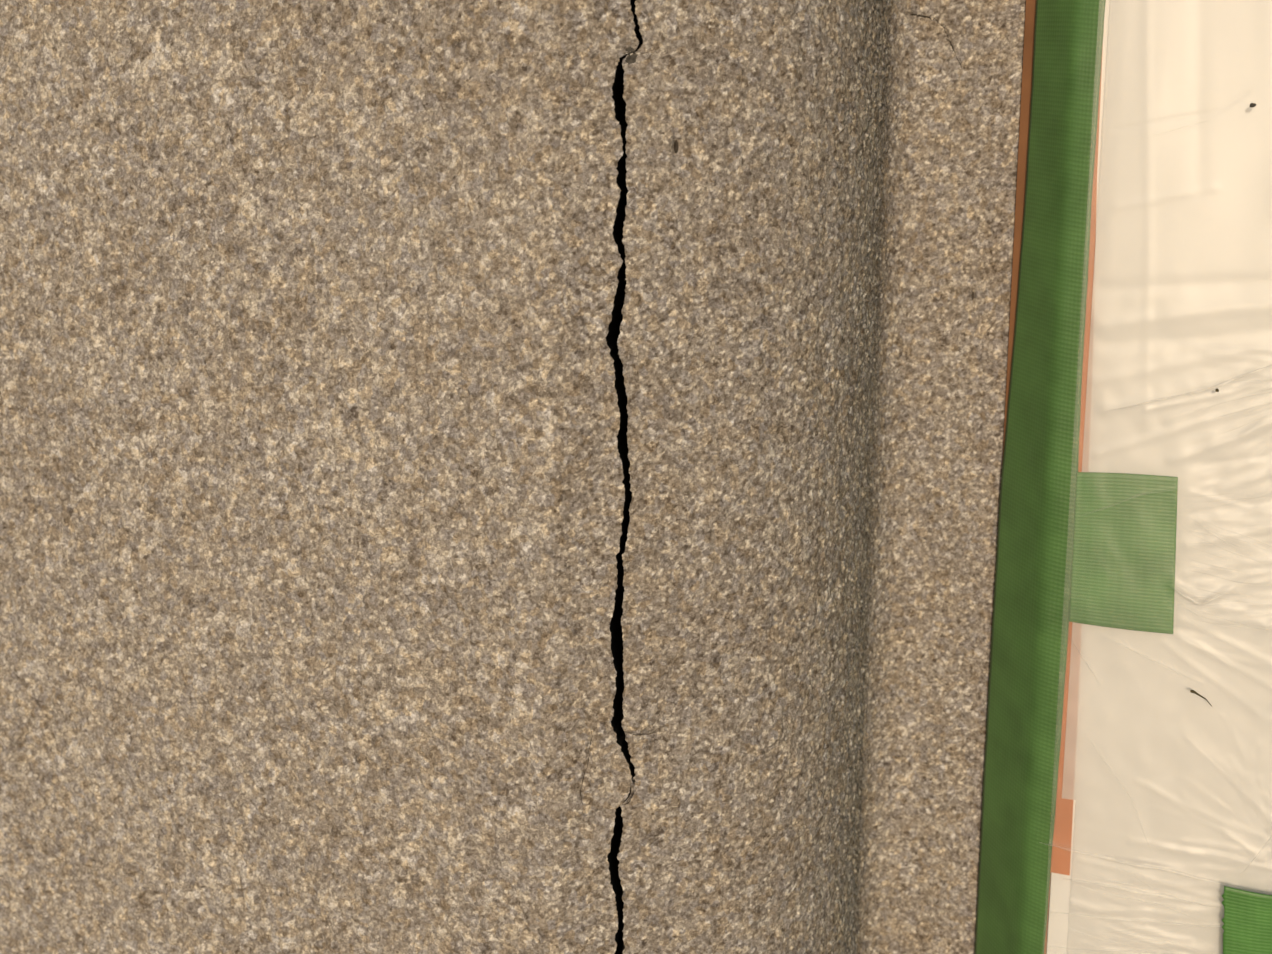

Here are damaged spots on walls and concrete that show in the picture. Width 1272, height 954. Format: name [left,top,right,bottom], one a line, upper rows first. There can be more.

crack [580,0,656,954]